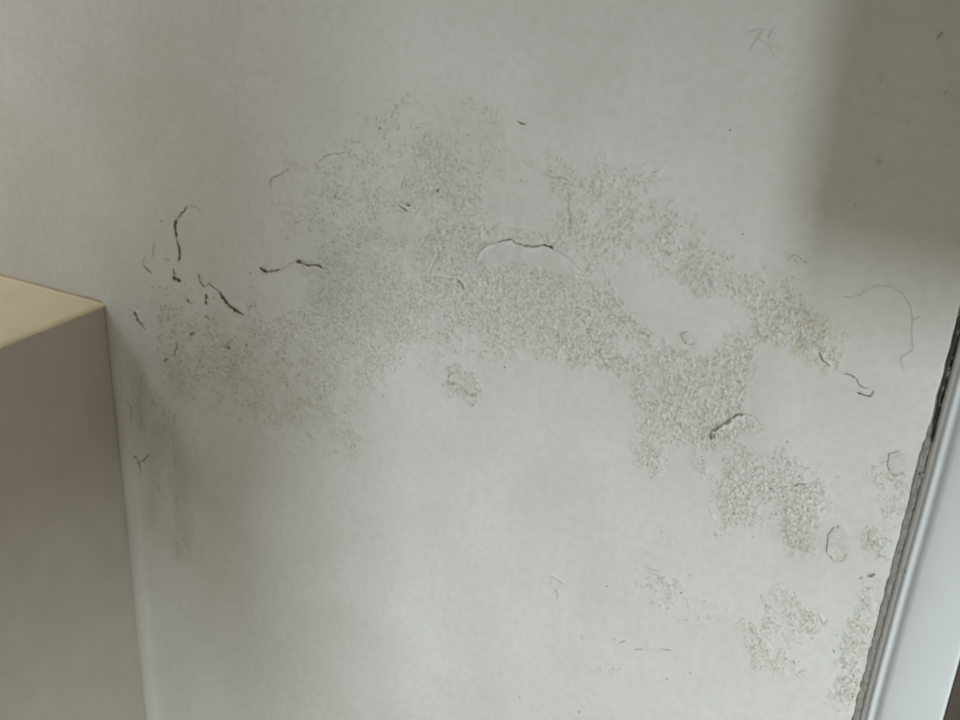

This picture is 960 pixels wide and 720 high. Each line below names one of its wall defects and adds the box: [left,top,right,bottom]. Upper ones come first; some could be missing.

crack [133,205,247,362]
crack [249,253,337,275]
crack [426,238,581,290]
crack [819,353,874,397]
crack [709,413,761,441]